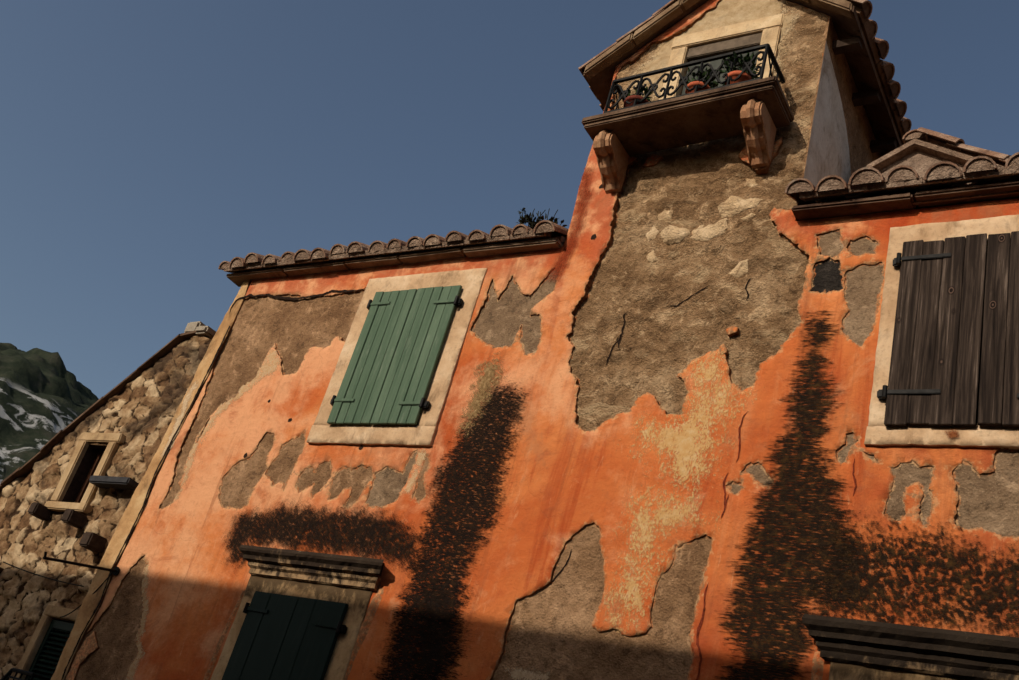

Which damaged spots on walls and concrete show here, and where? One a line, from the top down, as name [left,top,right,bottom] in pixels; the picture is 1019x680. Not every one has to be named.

spalling [472,270,557,355]
crack [606,312,627,365]
spalling [492,0,884,680]
spalling [161,290,364,509]
leakage [456,351,511,435]
spalling [219,431,430,509]
leakage [402,449,426,493]
spalling [952,449,1019,537]
spalling [66,555,152,680]
leakage [407,578,469,680]